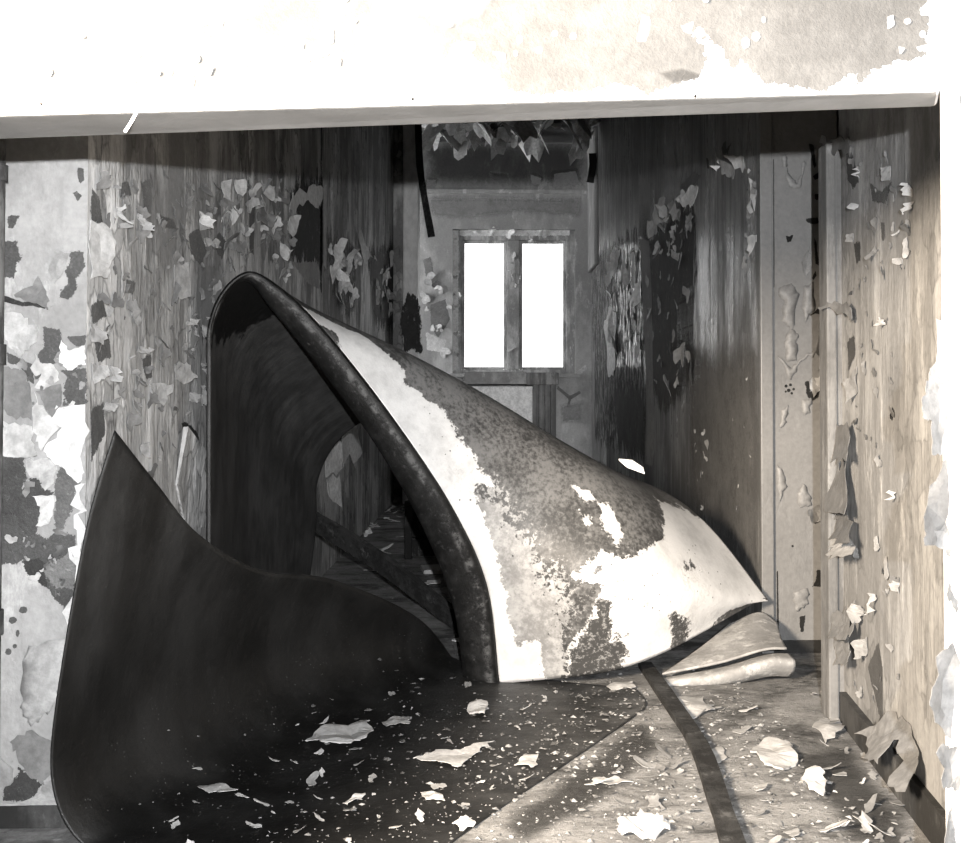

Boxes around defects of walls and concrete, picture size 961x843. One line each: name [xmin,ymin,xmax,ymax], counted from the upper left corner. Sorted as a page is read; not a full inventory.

damp [664,70,698,81]
peeling [422,118,601,187]
peeling [593,142,757,466]
peeling [785,135,914,400]
peeling [2,166,570,625]
peeling [808,336,882,559]
peeling [828,536,919,792]
peeling [0,730,57,806]
peeling [305,716,412,744]
peeling [414,741,494,767]
peeling [514,754,538,767]
peeling [452,815,476,831]